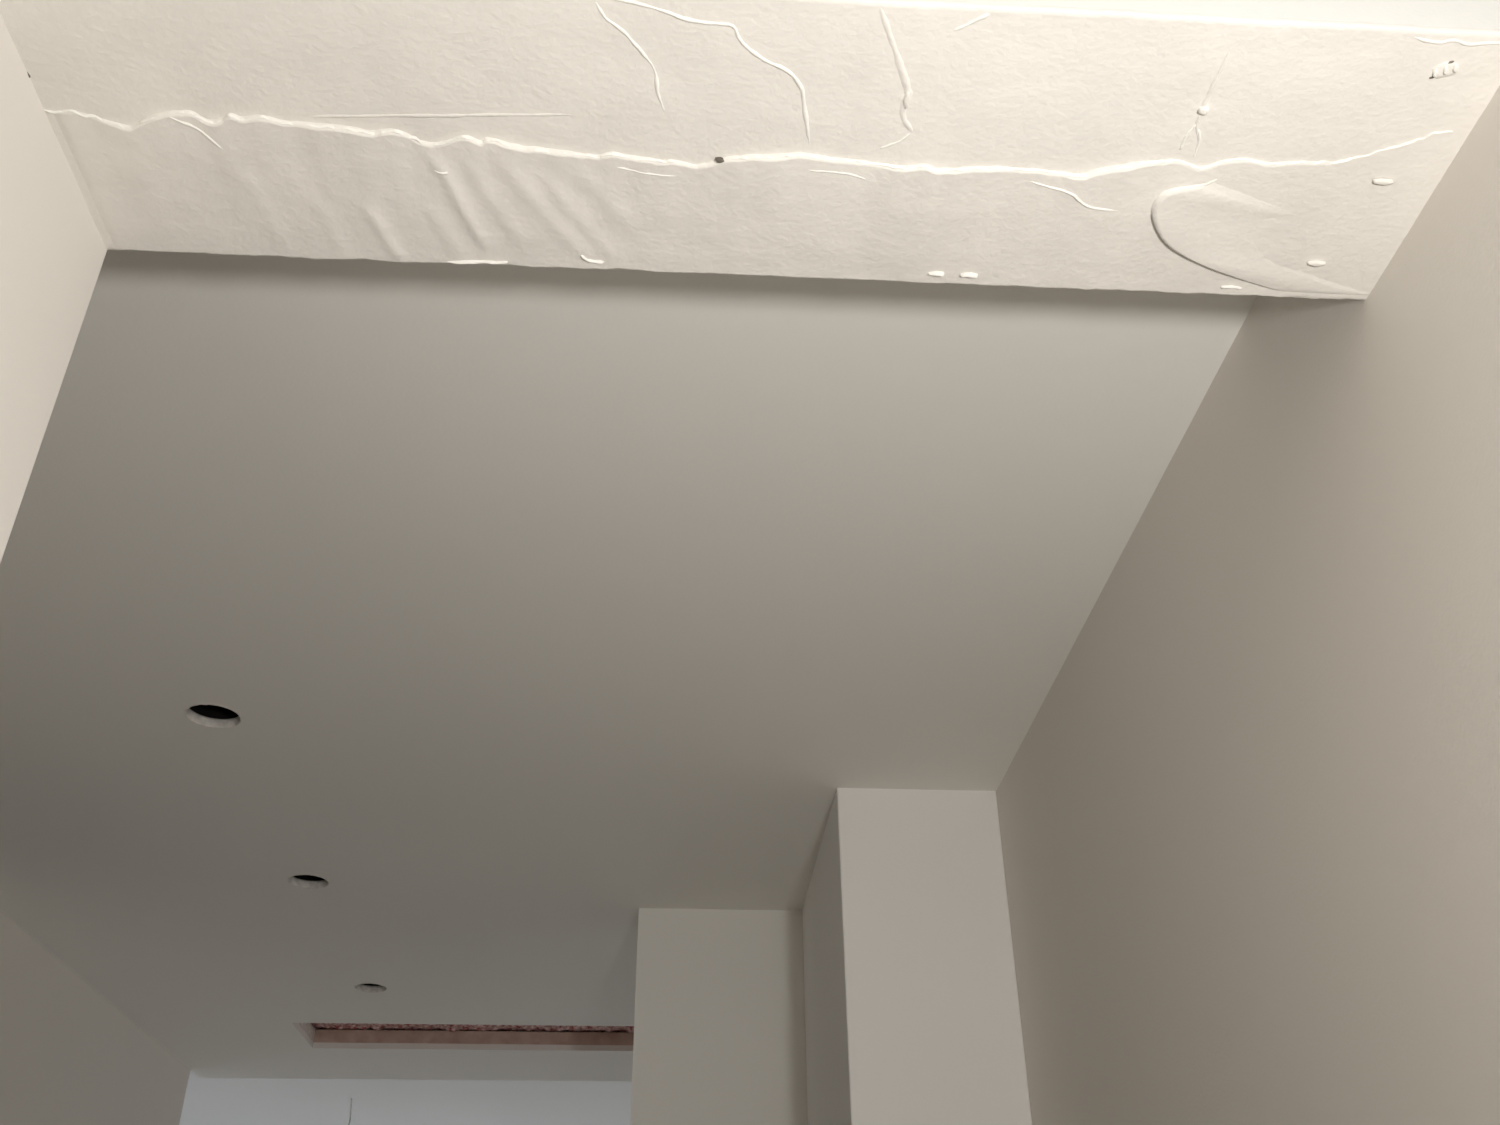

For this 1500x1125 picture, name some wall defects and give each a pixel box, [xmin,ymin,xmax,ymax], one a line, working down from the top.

crack [44,0,1453,211]